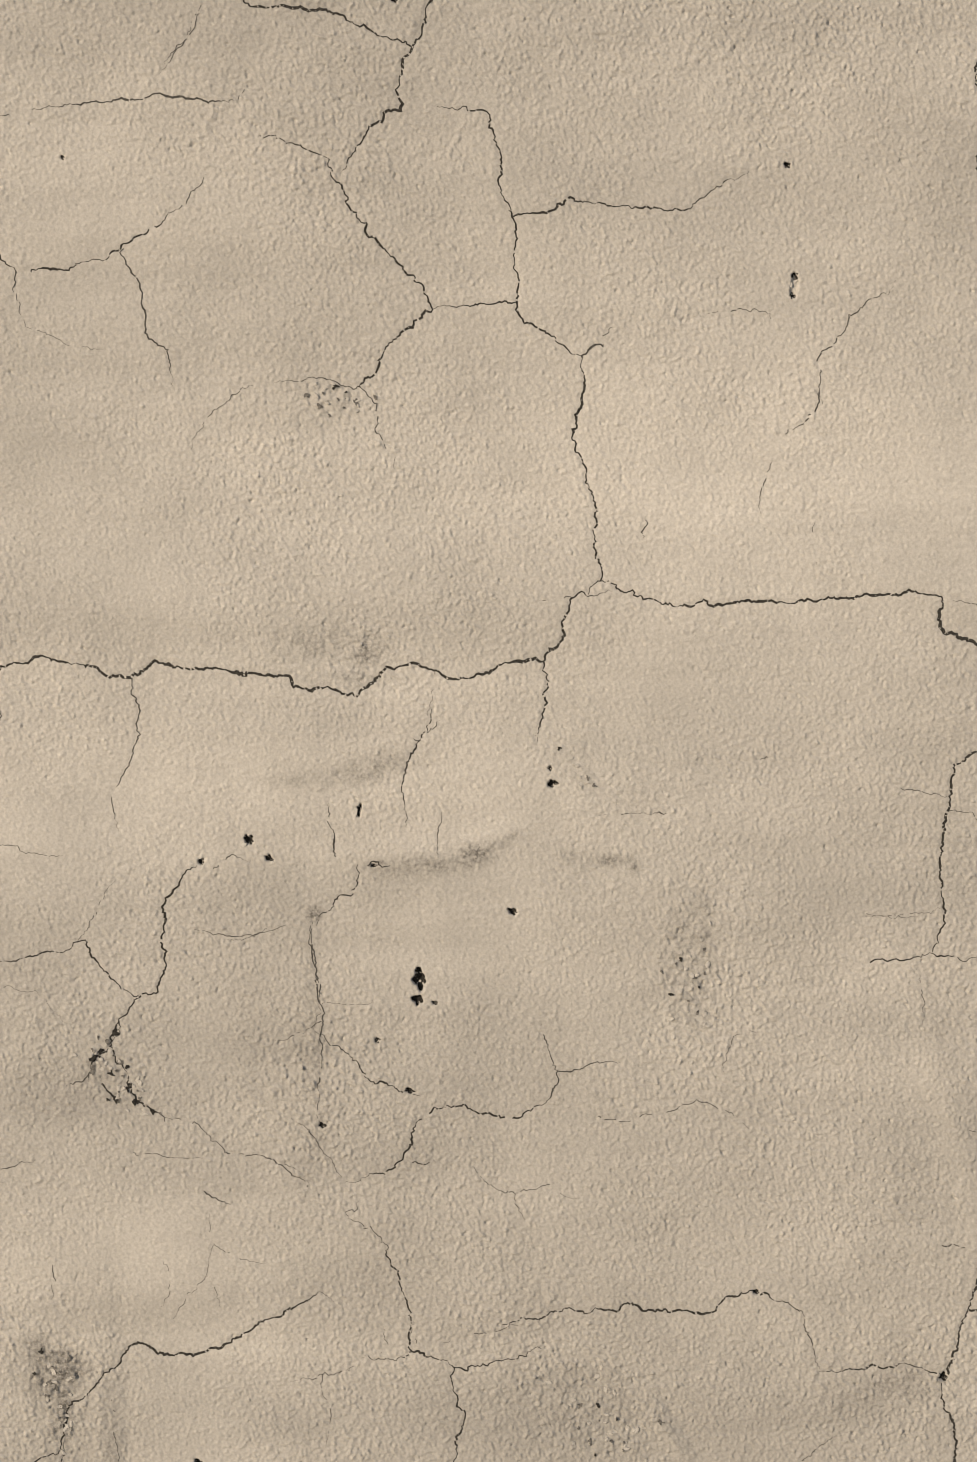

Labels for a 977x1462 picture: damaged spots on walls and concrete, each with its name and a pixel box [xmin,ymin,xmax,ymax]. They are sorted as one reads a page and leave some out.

crack [0,0,977,854]
crack [0,805,977,1462]
crack [866,751,977,1024]